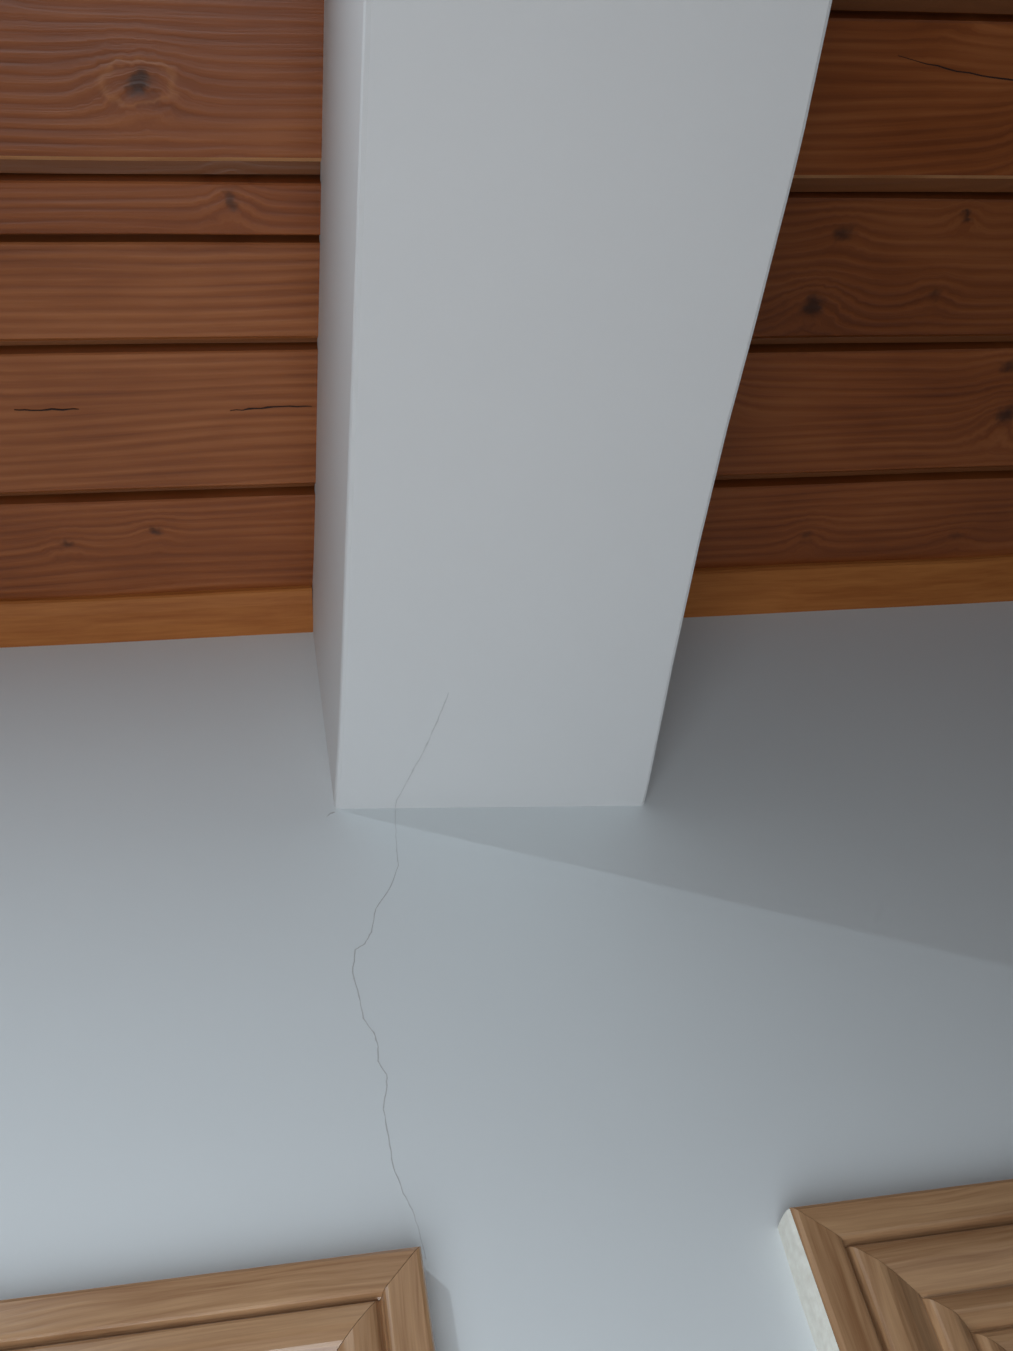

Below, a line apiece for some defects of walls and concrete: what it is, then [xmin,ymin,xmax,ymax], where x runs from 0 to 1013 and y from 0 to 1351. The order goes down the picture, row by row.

crack [352,694,448,1258]